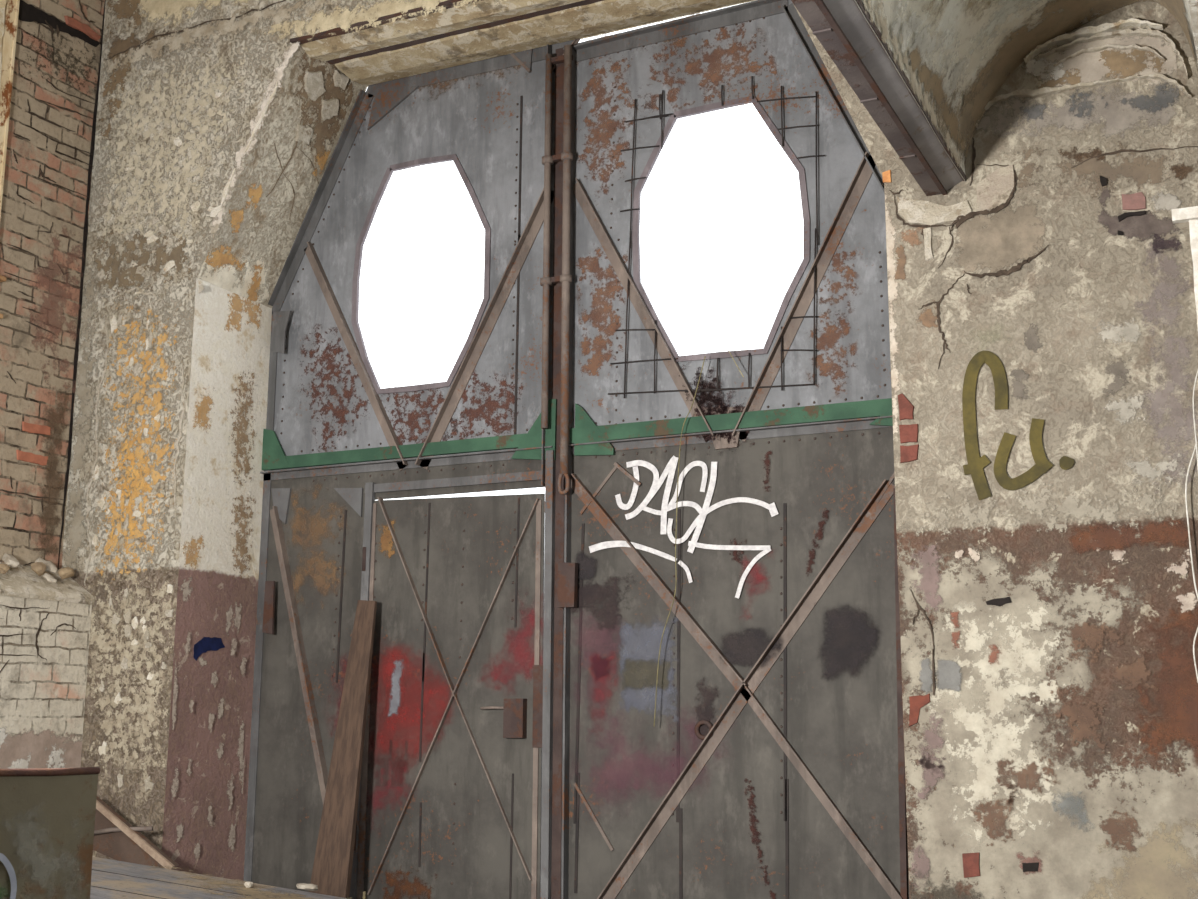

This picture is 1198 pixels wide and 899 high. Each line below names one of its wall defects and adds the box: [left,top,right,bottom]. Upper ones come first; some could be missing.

peeling [0,0,477,853]
corrosion [301,325,523,452]
corrosion [577,23,781,205]
corrosion [809,251,859,394]
crack [889,190,971,369]
crack [970,138,1017,186]
crack [1071,146,1198,168]
spalling [1098,176,1182,253]
peeling [897,527,1198,899]